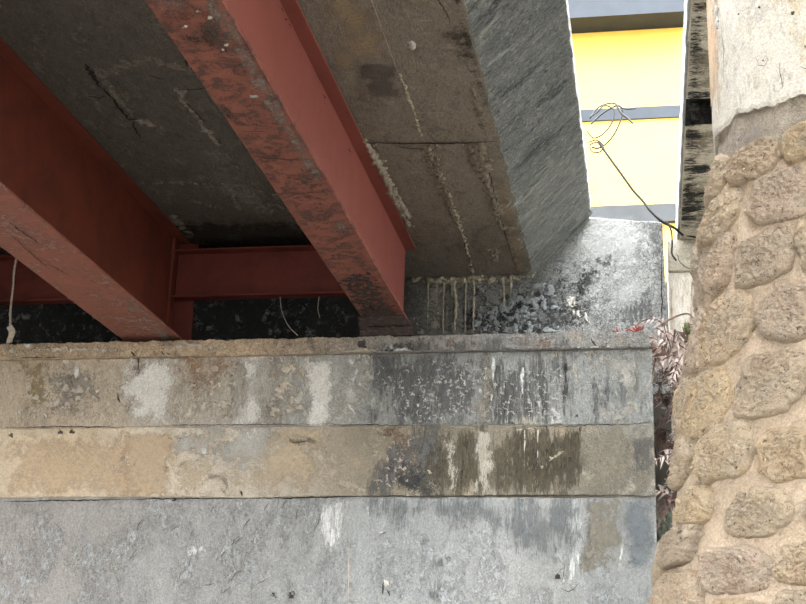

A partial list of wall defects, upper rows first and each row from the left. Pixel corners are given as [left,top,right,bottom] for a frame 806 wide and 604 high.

crack [85,64,157,138]
water stain [326,0,398,97]
crack [372,0,497,149]
water stain [681,2,711,229]
water stain [643,223,666,258]
rust [335,272,396,317]
peeling [462,269,619,348]
water stain [47,364,99,414]
water stain [177,142,654,572]
water stain [9,434,174,496]